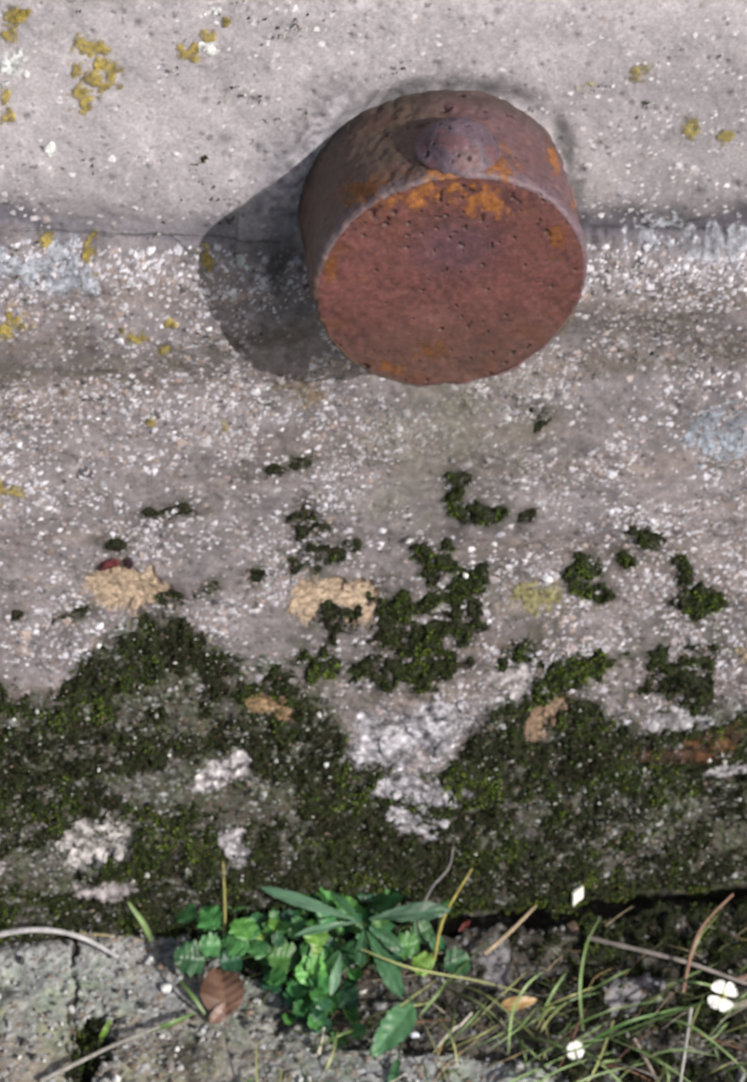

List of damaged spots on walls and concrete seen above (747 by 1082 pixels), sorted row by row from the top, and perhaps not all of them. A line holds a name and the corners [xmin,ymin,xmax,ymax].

rust [389,171,458,207]
crack [66,938,79,1025]